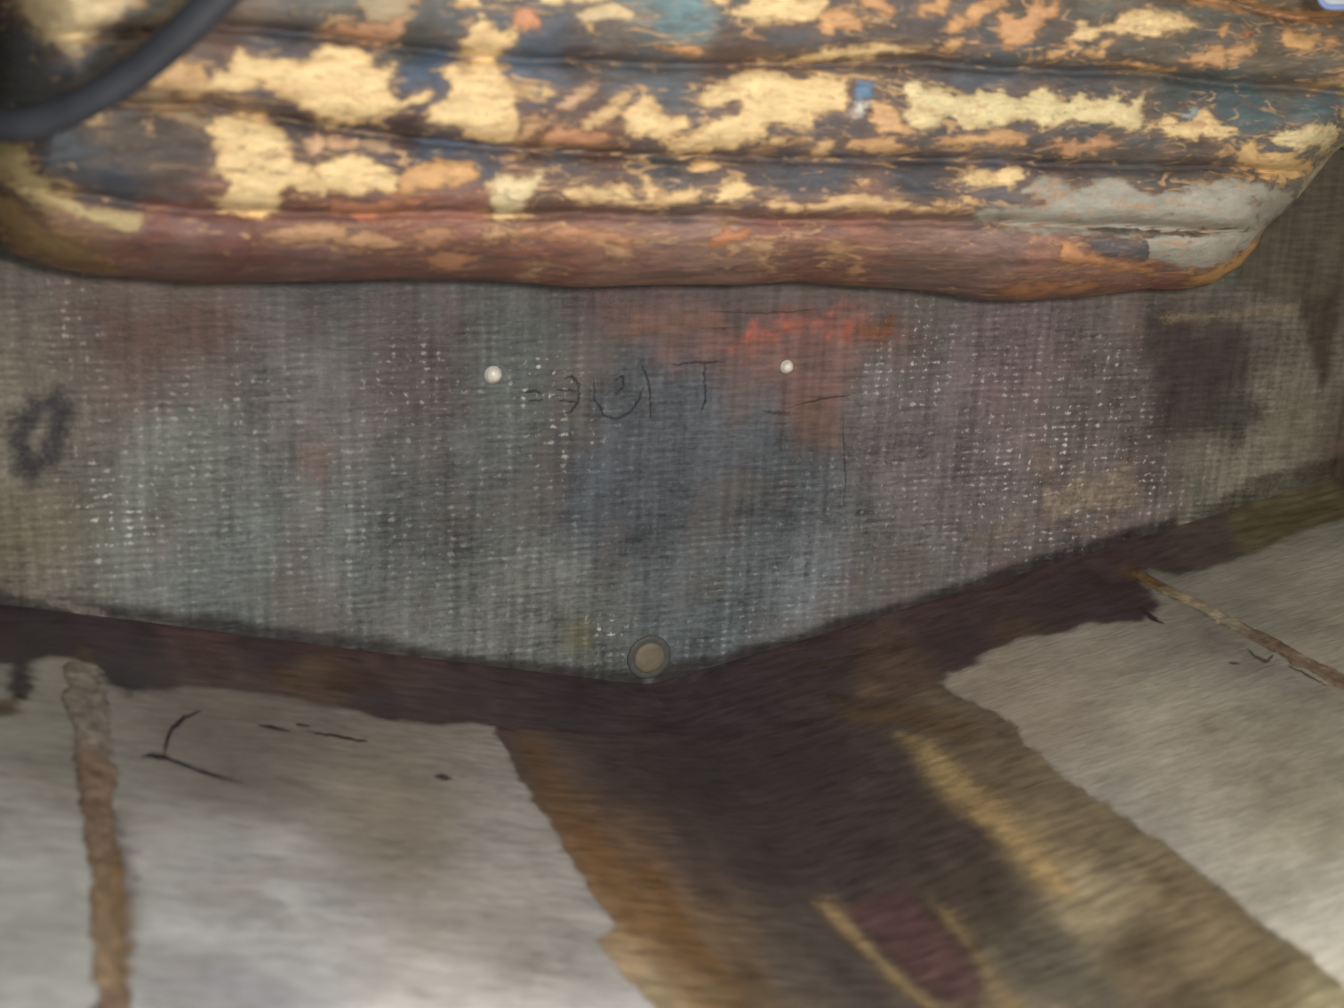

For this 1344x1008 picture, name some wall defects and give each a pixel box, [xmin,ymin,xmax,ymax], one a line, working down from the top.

peeling [5,0,138,61]
peeling [0,142,145,234]
peeling [93,0,1344,299]
crack [140,710,242,783]
water stain [492,655,1344,1008]